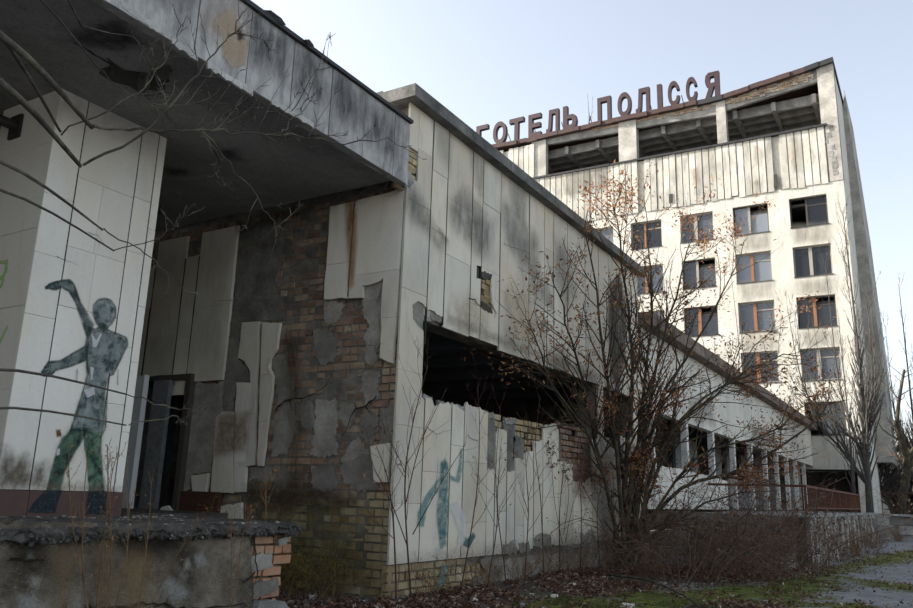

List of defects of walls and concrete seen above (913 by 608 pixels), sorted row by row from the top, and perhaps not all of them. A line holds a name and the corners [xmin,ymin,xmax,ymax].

spalling [120,0,253,96]
spalling [99,58,173,96]
spalling [270,98,314,130]
rust [347,203,355,279]
spalling [476,267,493,314]
spalling [412,301,442,328]
crack [275,376,331,411]
flaking render [249,283,394,492]
crack [341,396,377,437]
flaking render [250,599,289,608]